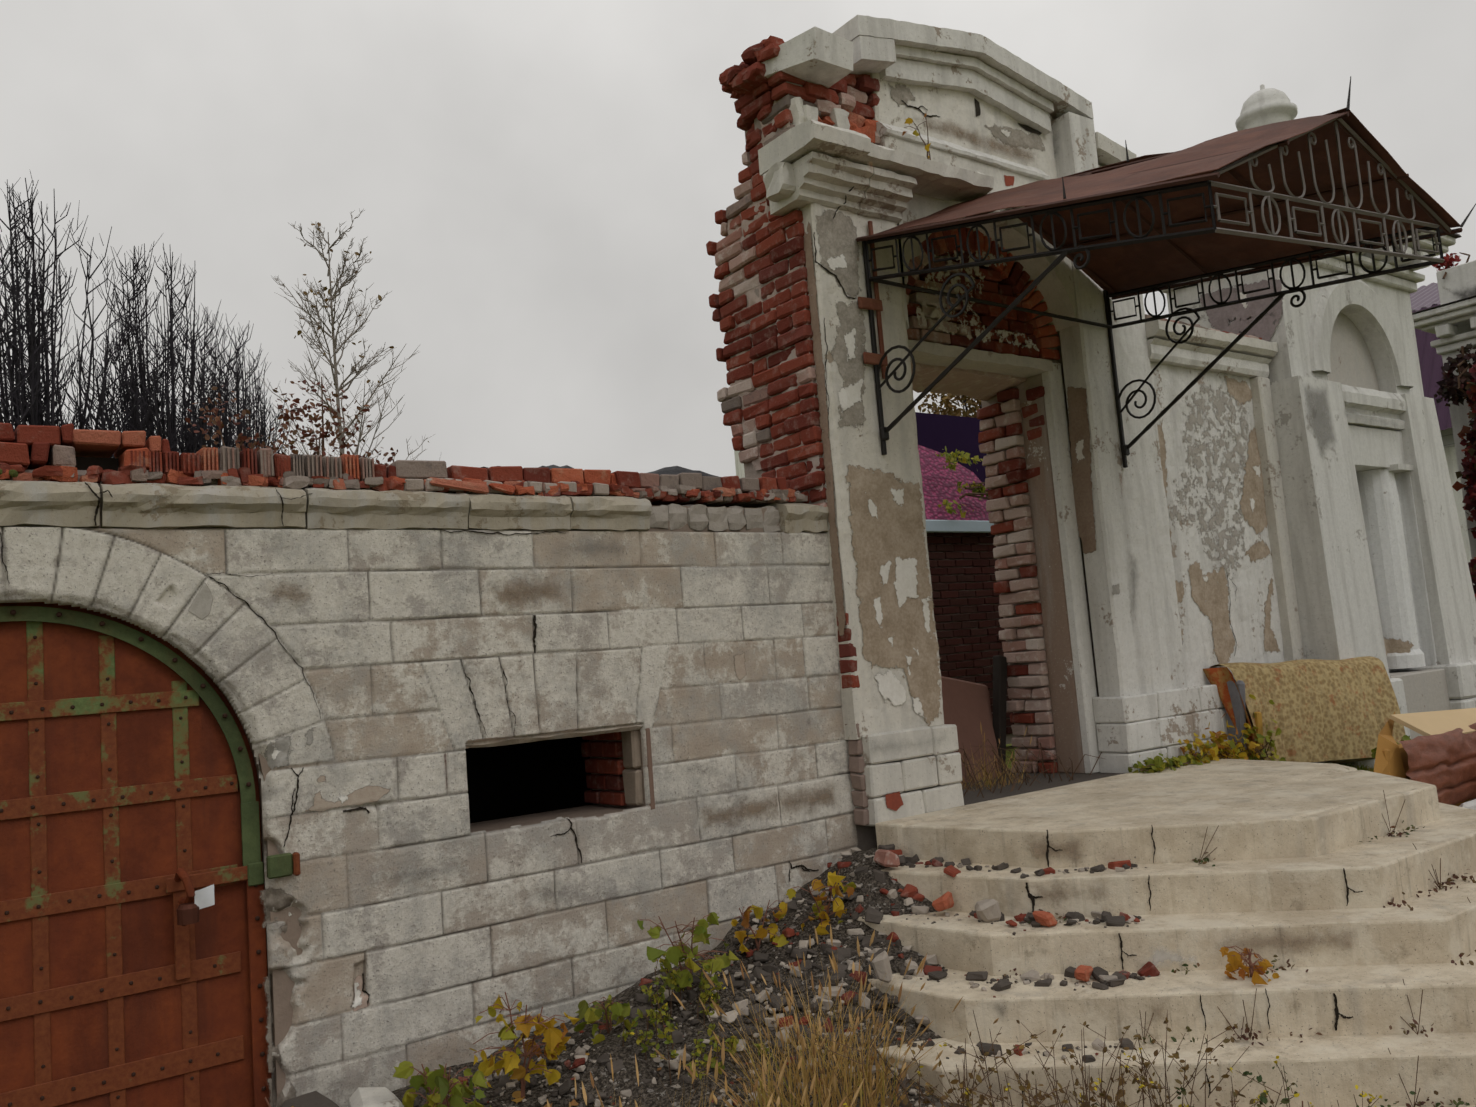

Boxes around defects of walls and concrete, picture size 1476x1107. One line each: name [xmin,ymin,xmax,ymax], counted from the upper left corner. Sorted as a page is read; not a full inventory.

spalling [719,42,783,95]
peeling [803,209,942,726]
peeling [1157,375,1272,667]
peeling [1263,579,1280,653]
crack [461,658,516,737]
crack [284,768,304,846]
spalling [260,888,301,933]
crack [1025,830,1063,912]
spalling [352,975,370,1011]
spalling [263,975,296,1107]